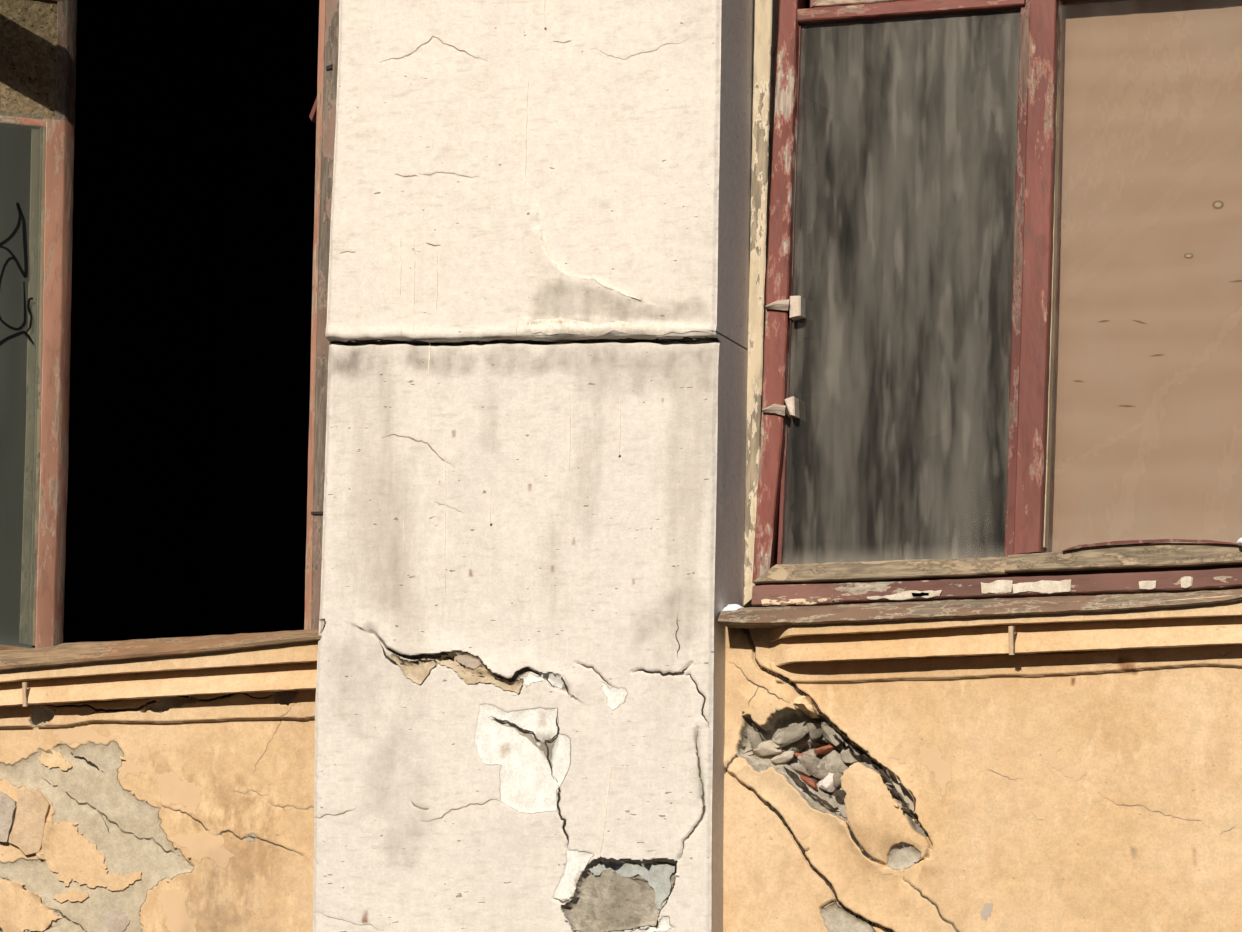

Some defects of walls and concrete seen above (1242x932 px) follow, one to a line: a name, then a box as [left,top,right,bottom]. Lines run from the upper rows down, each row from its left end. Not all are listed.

crack [331,336,719,346]
spalling [391,651,563,694]
peeling [0,707,234,932]
crack [43,778,192,865]
crack [26,693,355,818]
crack [161,805,303,856]
peeling [475,704,570,814]
spalling [553,850,679,932]
crack [373,615,894,932]
spalling [734,695,938,877]
crack [846,821,959,932]